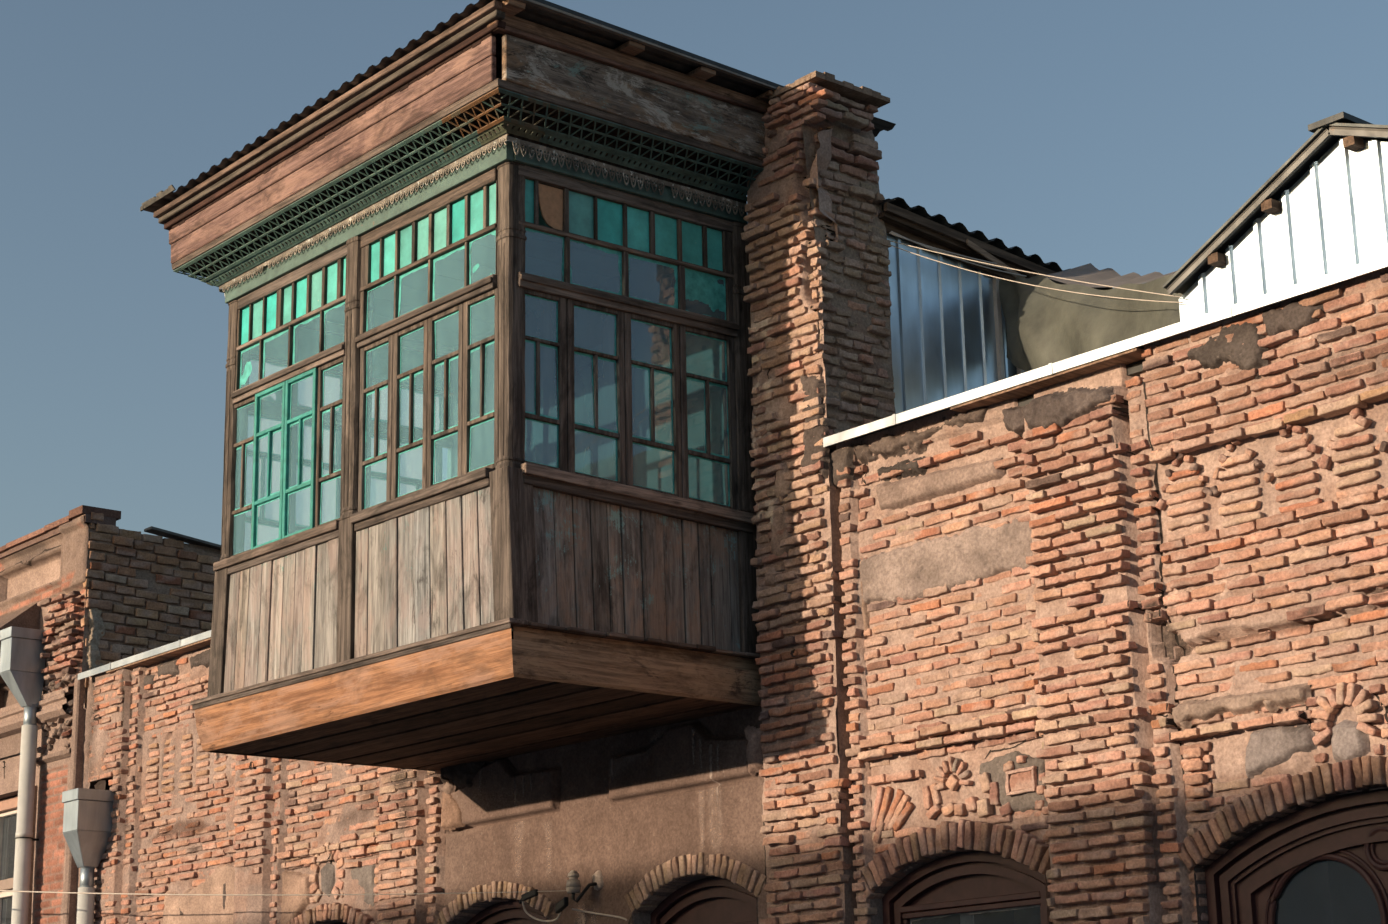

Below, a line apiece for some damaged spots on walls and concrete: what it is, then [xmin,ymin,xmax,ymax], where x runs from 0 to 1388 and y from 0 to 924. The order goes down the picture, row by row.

crack [1112,382,1185,783]